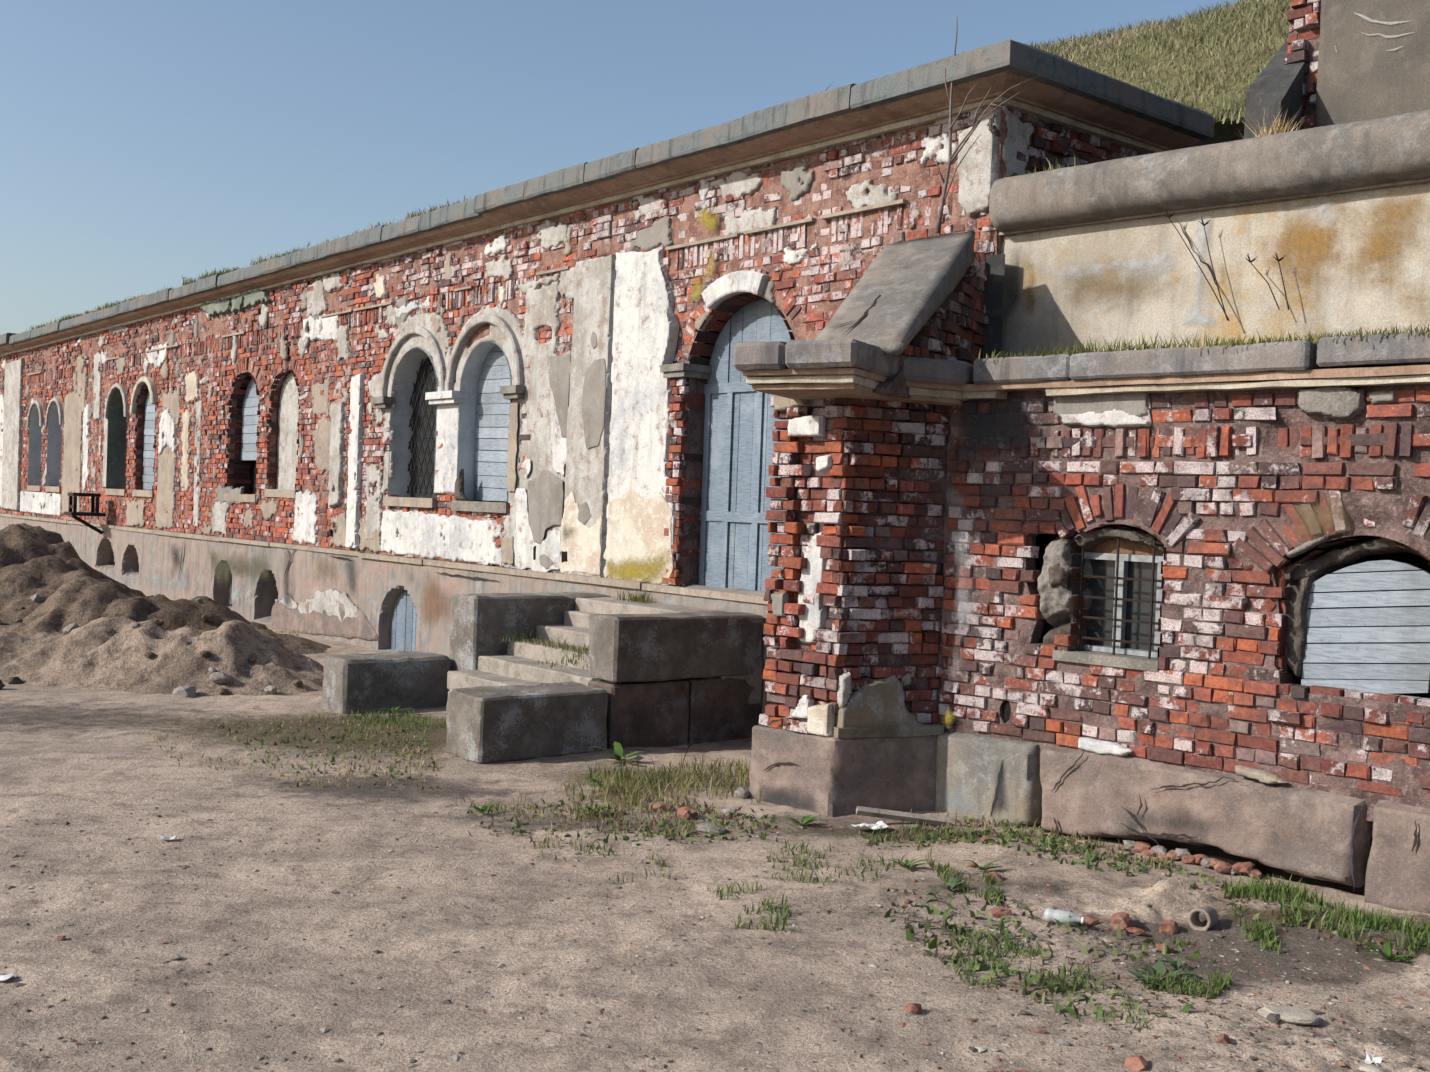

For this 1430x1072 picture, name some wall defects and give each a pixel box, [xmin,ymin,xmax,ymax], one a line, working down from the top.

flaking render [699,161,815,236]
flaking render [846,179,898,214]
flaking render [918,107,1034,217]
flaking render [751,274,776,304]
flaking render [784,243,818,265]
flaking render [0,194,713,586]
flaking render [773,395,826,437]
flaking render [816,455,834,473]
flaking render [771,532,830,644]
crack [1121,776,1244,847]